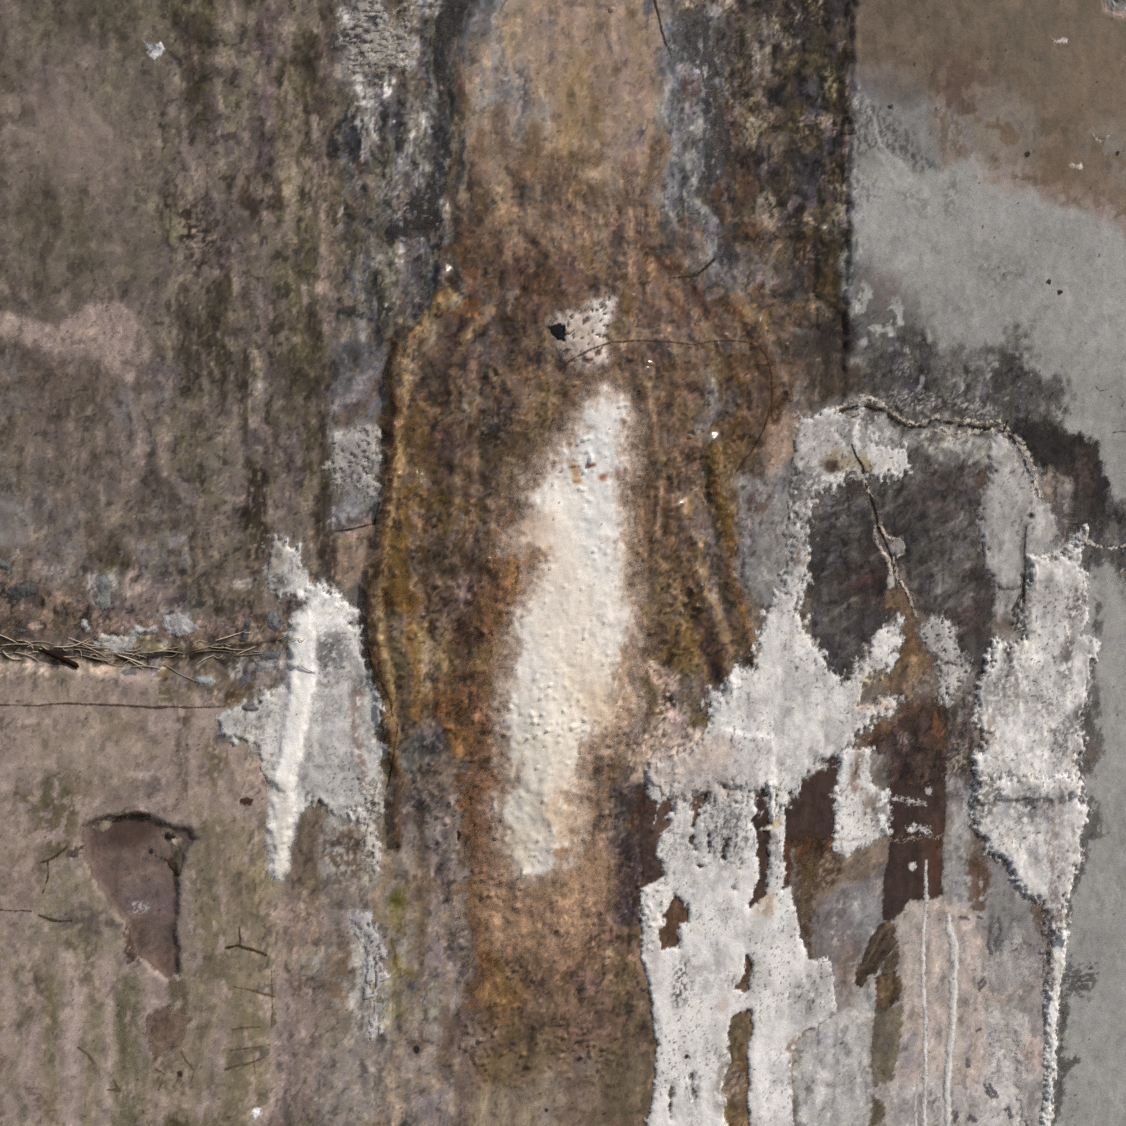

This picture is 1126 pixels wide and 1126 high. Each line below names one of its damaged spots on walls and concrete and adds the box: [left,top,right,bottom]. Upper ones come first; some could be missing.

rust [704,441,732,542]
crack [835,394,1043,618]
crack [1012,526,1126,611]
efflorescence [215,534,387,881]
rust [423,548,539,1022]
peeling [888,783,932,807]
peeling [889,823,943,844]
crack [1,846,72,923]
spalling [67,805,193,977]
efflorescence [350,905,390,1041]
peeling [855,921,903,1009]
peeling [146,1006,192,1061]